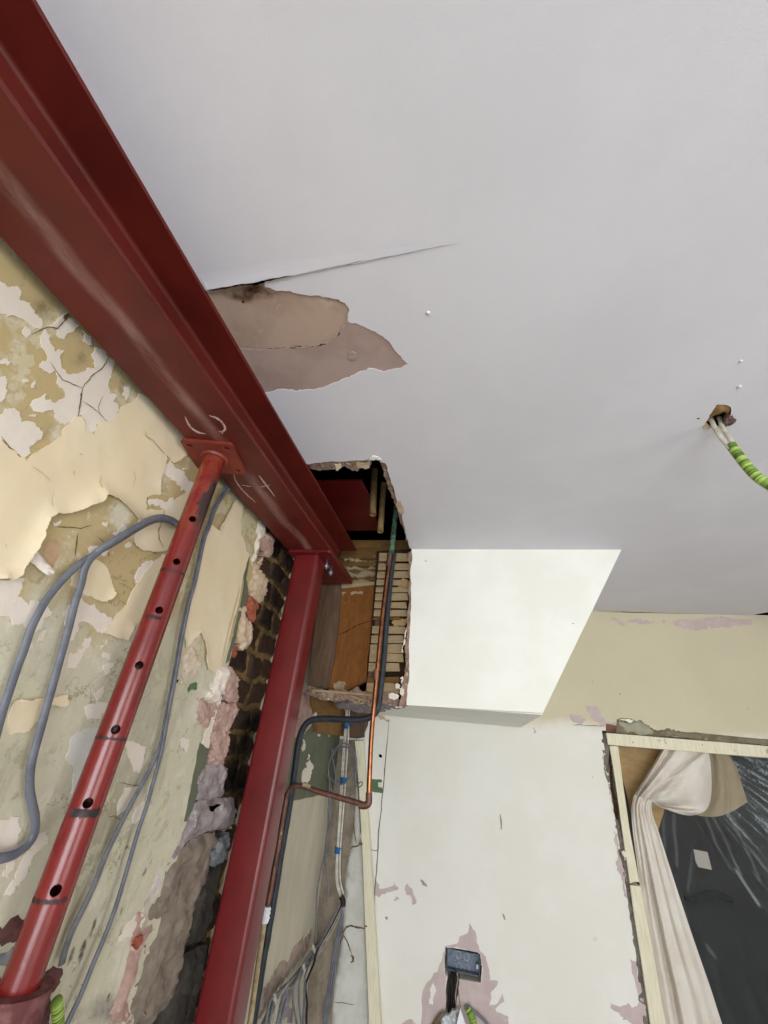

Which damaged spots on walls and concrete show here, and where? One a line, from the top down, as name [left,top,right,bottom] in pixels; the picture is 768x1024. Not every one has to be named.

crack [200,242,455,292]
crack [31,313,71,335]
peeling [207,282,407,392]
crack [51,358,108,421]
peeling [0,281,194,795]
peeling [107,499,275,1024]
peeling [0,816,48,896]
spalling [0,914,24,979]
spalling [41,966,63,1024]
peeling [402,924,509,1024]